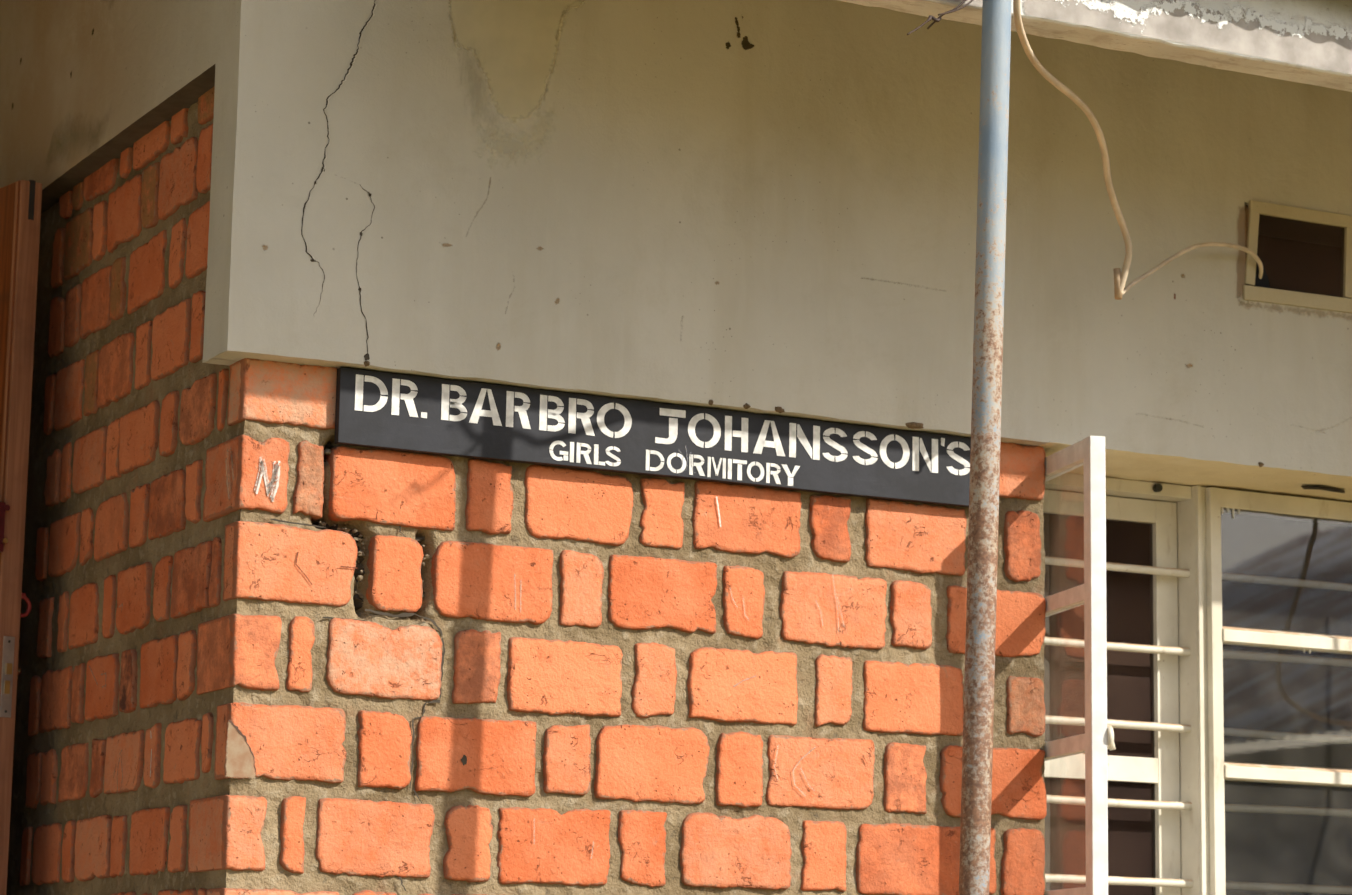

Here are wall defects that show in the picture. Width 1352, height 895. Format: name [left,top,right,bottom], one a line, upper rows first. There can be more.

crack [301,1,377,360]
peeling [1023,0,1352,74]